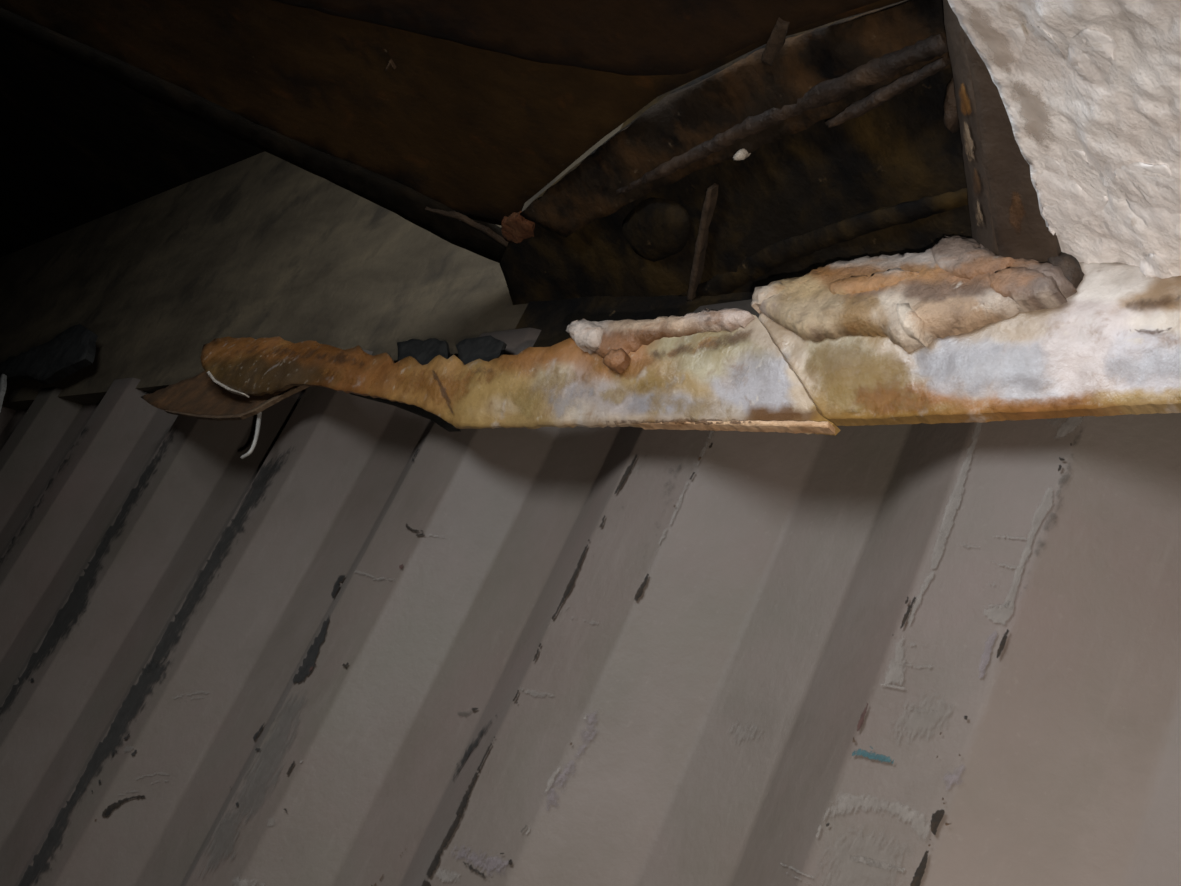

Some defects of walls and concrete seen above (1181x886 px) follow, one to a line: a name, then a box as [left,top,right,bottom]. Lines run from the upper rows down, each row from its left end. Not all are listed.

peeling [733,148,751,161]
corrosion [943,78,983,224]
corrosion [566,236,1077,377]
spalling [997,629,1009,658]